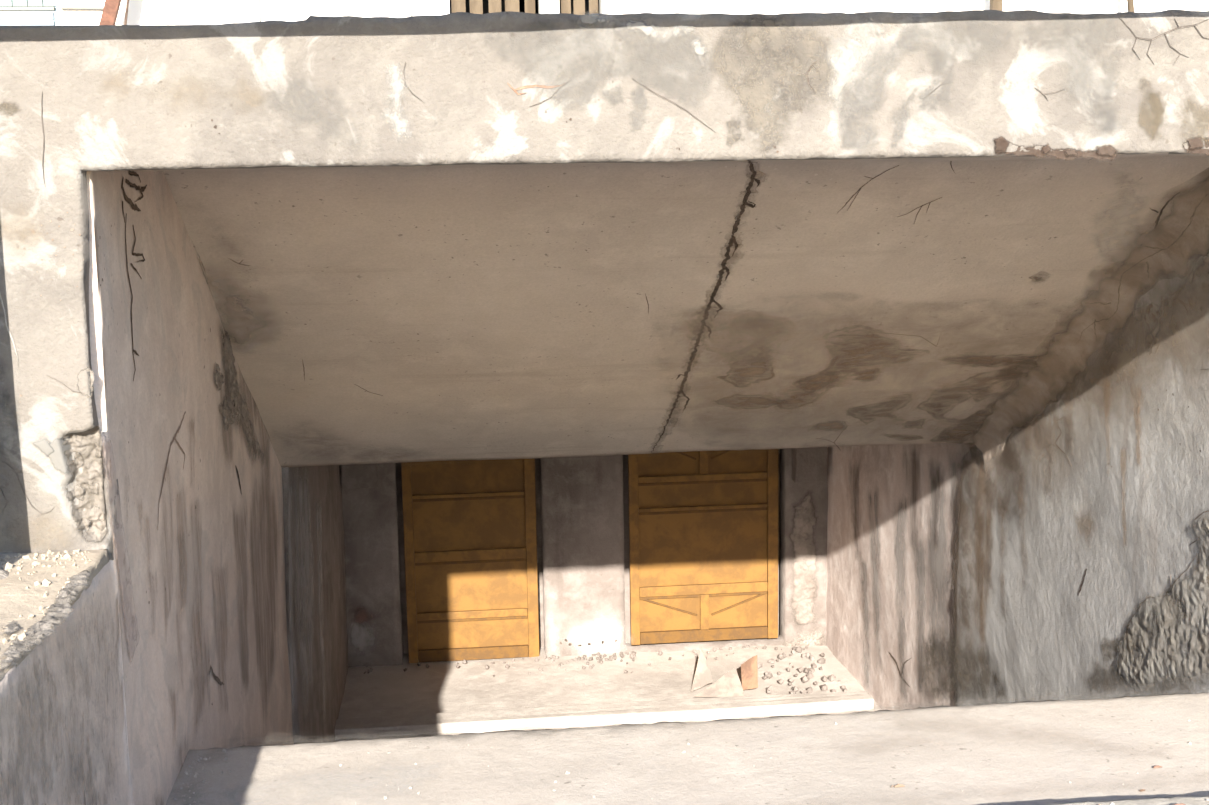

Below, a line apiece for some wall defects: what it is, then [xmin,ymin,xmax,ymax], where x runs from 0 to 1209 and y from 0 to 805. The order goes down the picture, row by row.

crack [633,79,715,132]
spalling [994,136,1117,161]
crack [1120,18,1209,65]
spalling [1183,137,1209,155]
crack [121,170,147,381]
crack [651,160,760,454]
water stain [715,330,914,408]
water stain [816,356,1037,443]
spalling [33,426,140,661]
water stain [854,473,879,635]
water stain [896,277,1209,700]
flaking render [1117,515,1209,686]